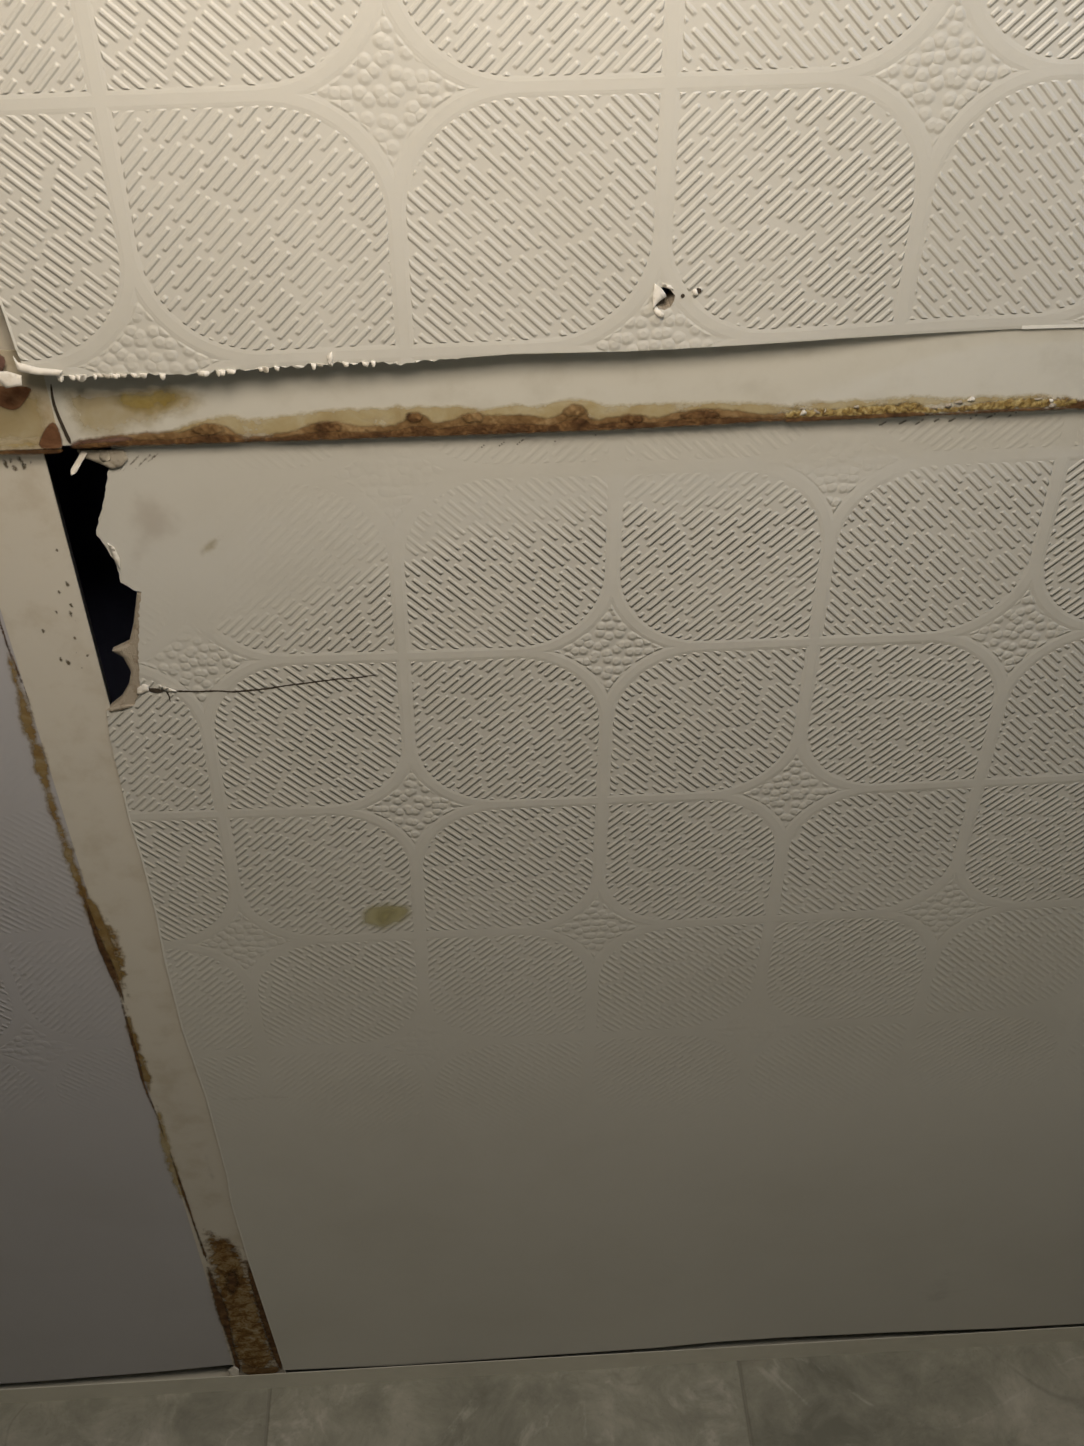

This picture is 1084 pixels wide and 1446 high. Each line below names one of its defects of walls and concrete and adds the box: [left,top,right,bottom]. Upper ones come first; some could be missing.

corrosion [0,355,1084,455]
spalling [71,449,155,476]
spalling [107,543,120,568]
spalling [106,591,149,713]
crack [149,675,374,702]
water stain [365,906,407,926]
corrosion [0,622,282,1376]